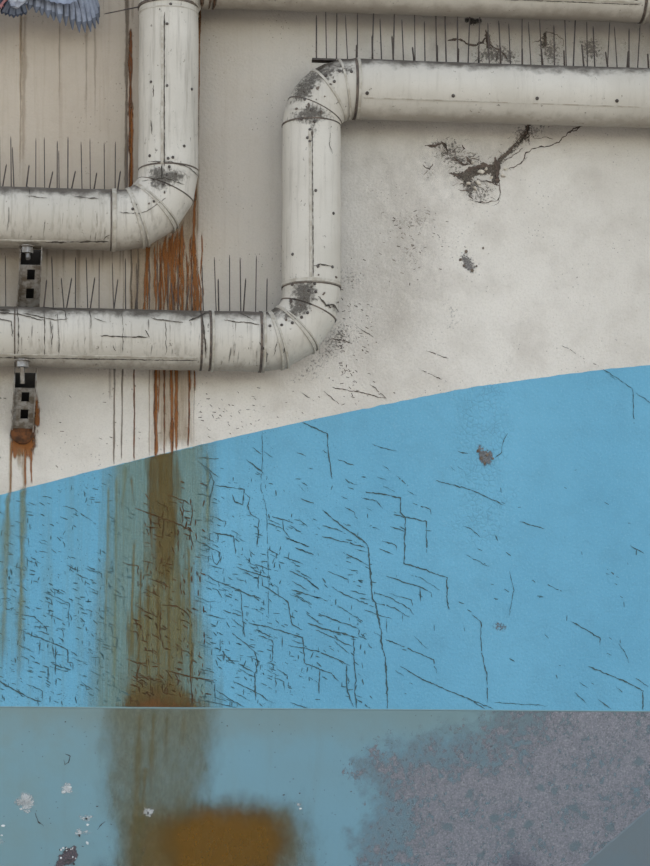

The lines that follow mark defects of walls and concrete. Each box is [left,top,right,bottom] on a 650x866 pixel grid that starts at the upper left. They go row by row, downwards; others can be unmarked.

rust [125,0,134,188]
rust [198,0,217,120]
rust [130,184,204,311]
spalling [459,250,477,273]
crack [301,386,387,404]
crack [563,346,650,419]
rust [4,399,40,553]
rust [99,369,205,707]
crack [465,526,561,609]
crack [566,617,647,709]
spalling [56,815,92,866]
peeling [342,711,650,866]